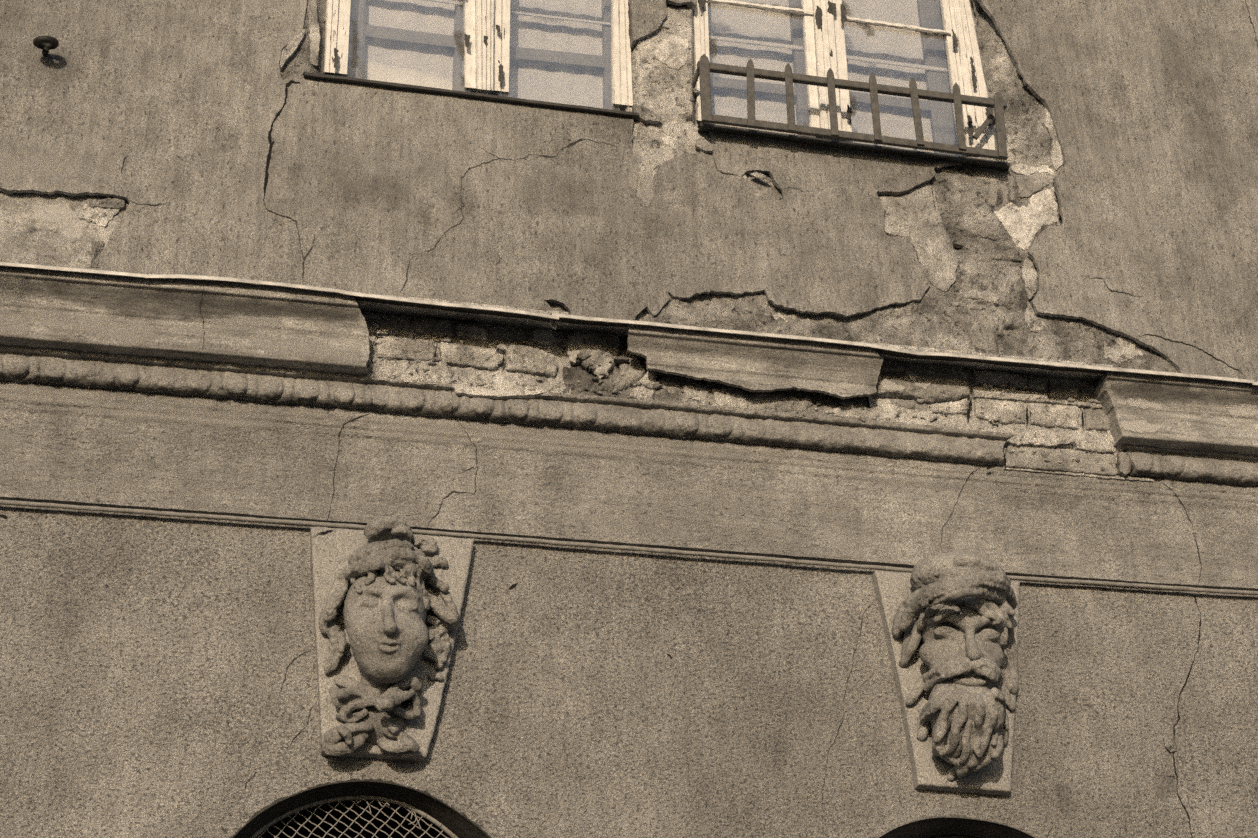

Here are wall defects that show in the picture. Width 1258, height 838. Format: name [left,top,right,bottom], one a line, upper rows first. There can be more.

flaking render [279,0,339,84]
flaking render [0,191,129,270]
crack [260,76,315,283]
crack [400,138,615,293]
flaking render [351,0,1178,482]
crack [1163,485,1202,838]